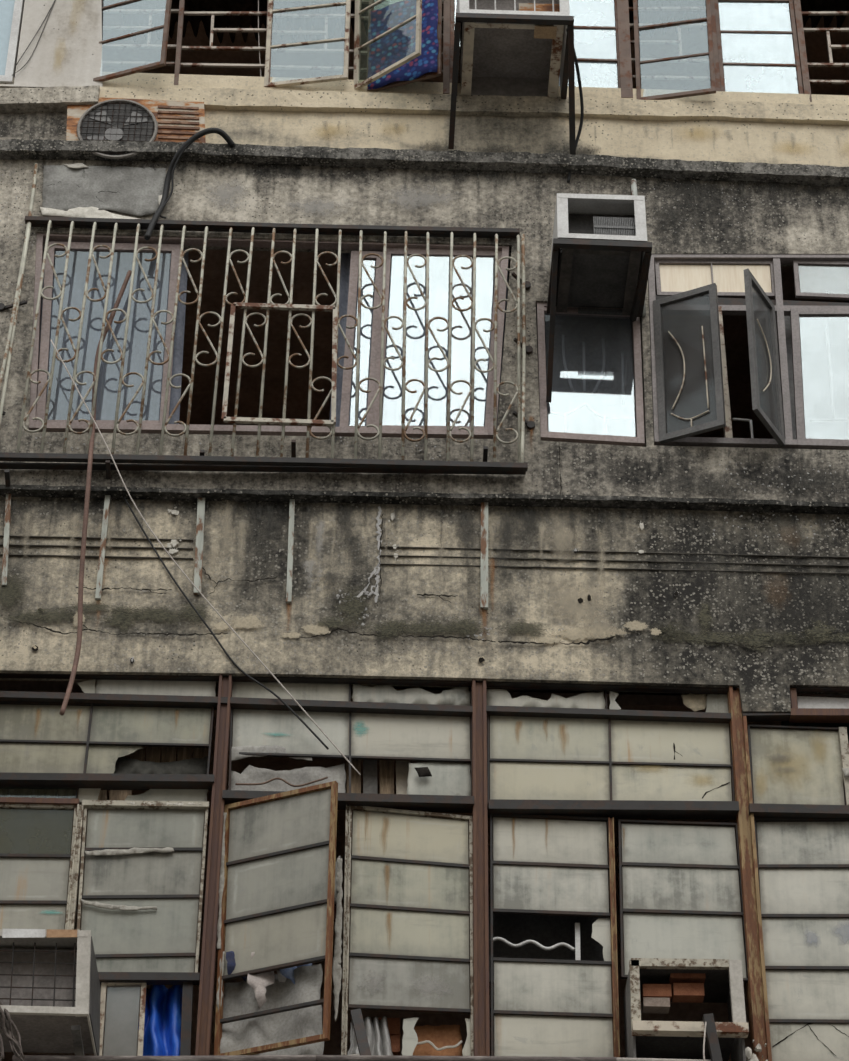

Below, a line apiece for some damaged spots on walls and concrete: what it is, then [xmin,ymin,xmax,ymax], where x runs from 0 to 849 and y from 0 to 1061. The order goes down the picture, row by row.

leakage [0,573,210,632]
leakage [304,561,487,639]
flaking render [214,614,262,630]
flaking render [281,623,331,639]
leakage [501,620,547,636]
flaking render [534,620,662,644]
leakage [651,601,849,652]